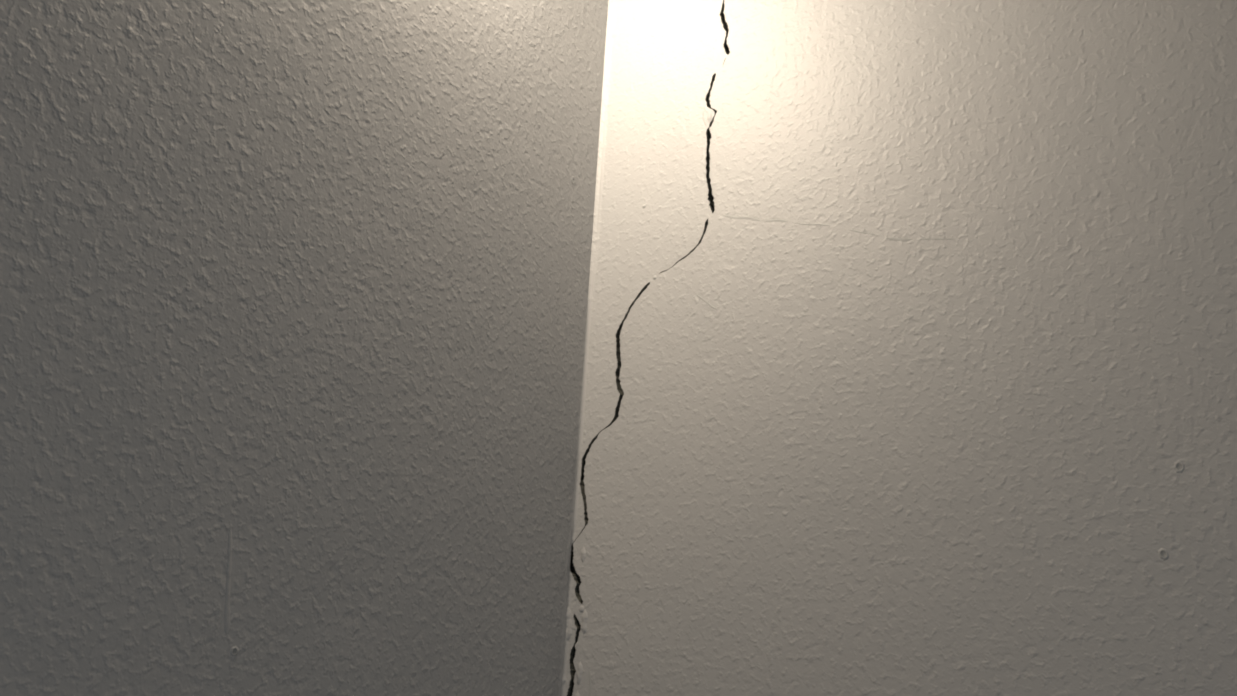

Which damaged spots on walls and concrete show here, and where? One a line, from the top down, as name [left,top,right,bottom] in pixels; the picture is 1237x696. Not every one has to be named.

crack [562,0,952,696]